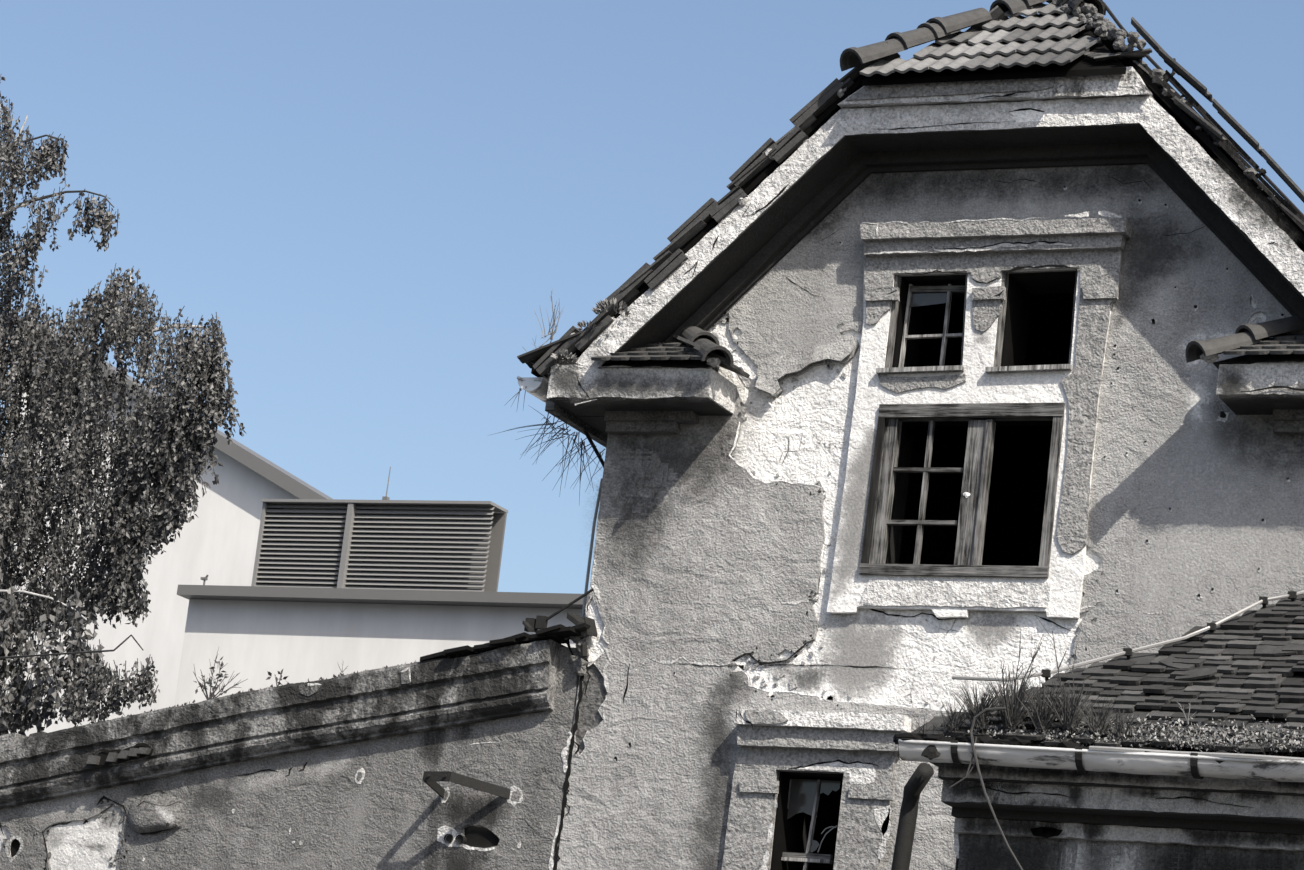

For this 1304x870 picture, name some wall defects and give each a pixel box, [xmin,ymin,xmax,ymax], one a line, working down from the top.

flaking render [705,314,1105,712]
crack [623,656,903,703]
water stain [423,724,469,766]
crack [548,639,591,870]
water stain [432,797,502,826]
flaking render [44,806,125,870]
crack [953,832,961,870]